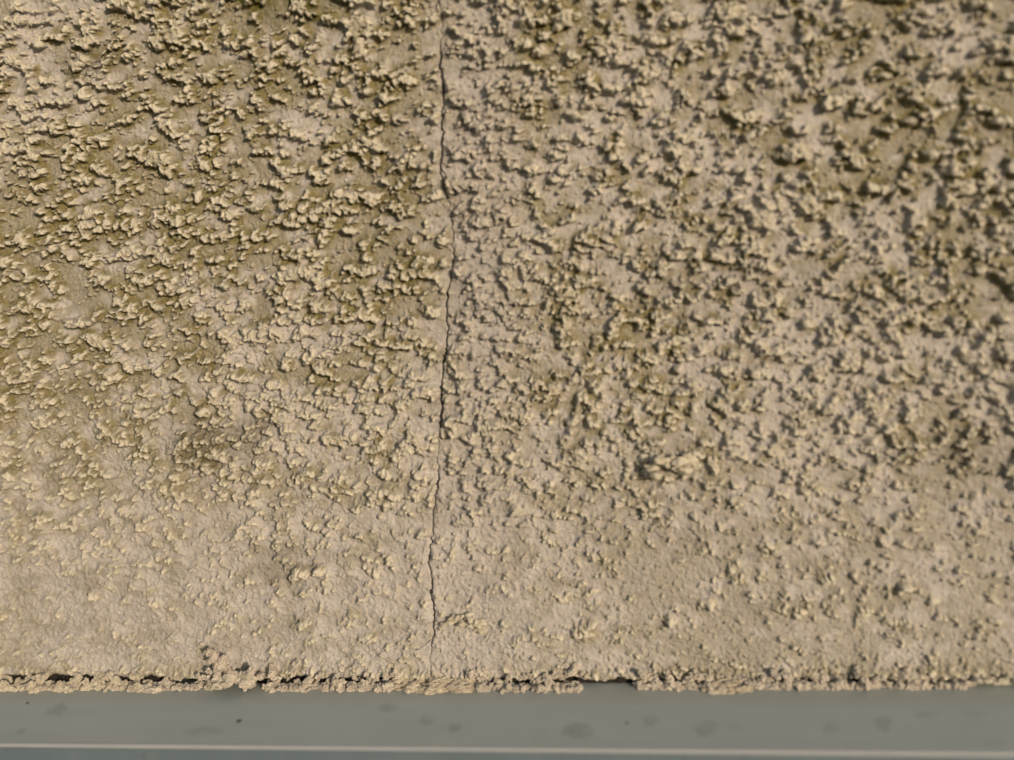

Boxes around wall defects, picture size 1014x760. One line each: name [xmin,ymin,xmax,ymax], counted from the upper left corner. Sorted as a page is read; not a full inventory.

crack [415,0,456,662]